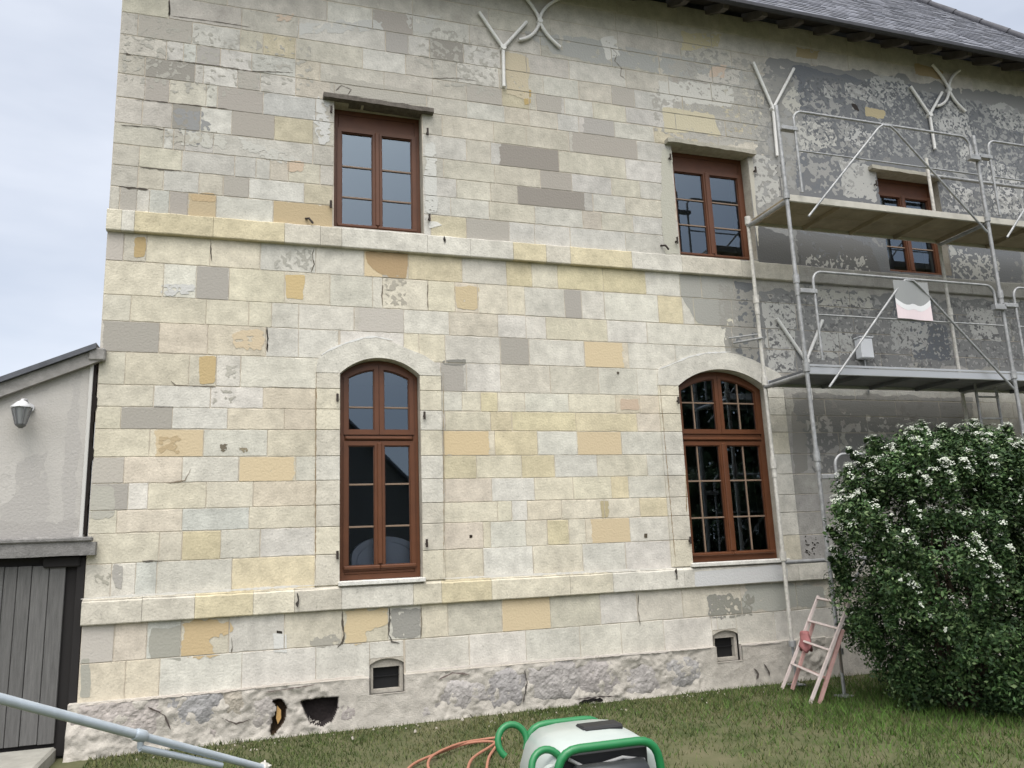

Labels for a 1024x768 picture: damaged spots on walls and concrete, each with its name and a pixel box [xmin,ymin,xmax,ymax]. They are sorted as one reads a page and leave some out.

peeling [601,36,620,60]
peeling [658,69,741,137]
peeling [753,75,1024,221]
peeling [806,254,870,271]
peeling [949,245,1000,282]
spalling [382,275,407,306]
peeling [761,289,1024,372]
spalling [707,593,755,620]
crack [337,612,345,648]
crack [388,608,422,643]
hole [271,699,287,735]
hole [301,697,339,726]